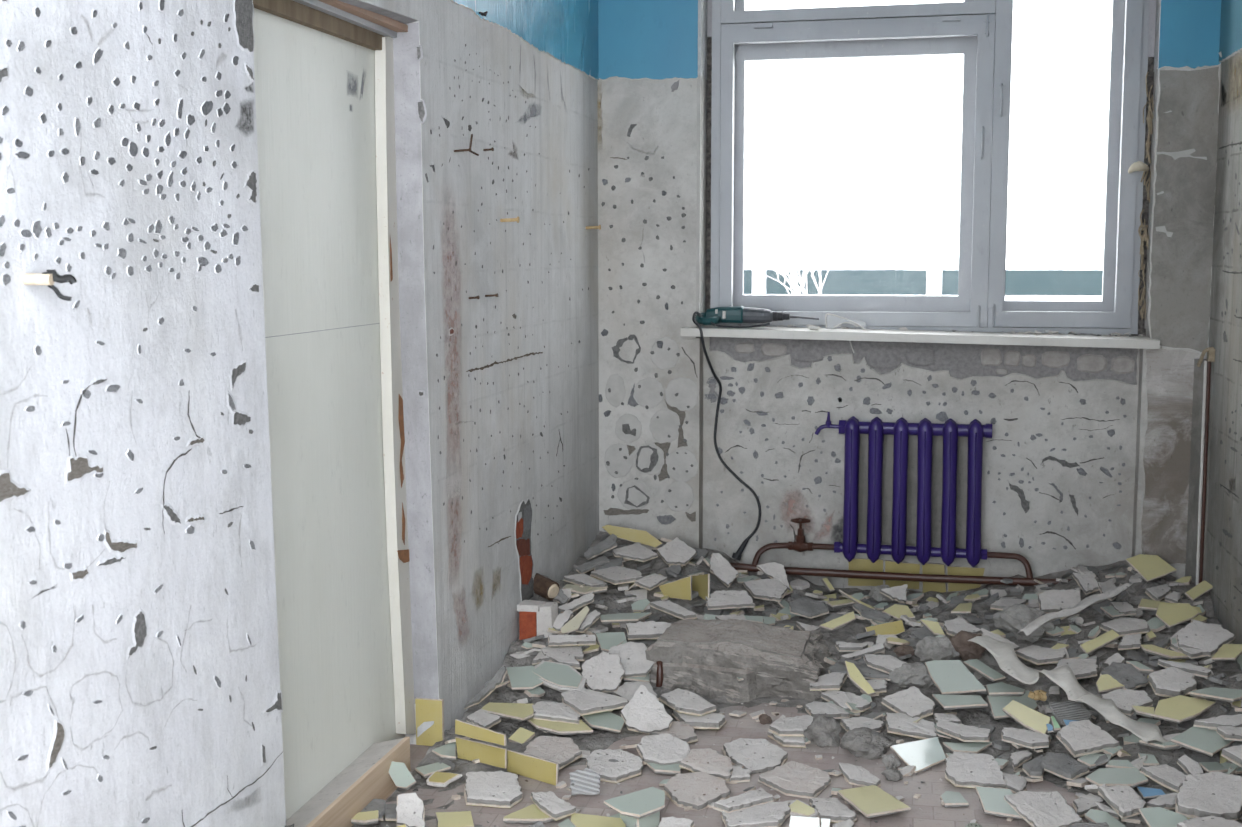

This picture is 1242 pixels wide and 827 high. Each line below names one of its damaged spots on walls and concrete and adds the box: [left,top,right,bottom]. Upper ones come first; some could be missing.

peeling [601,156,664,209]
peeling [643,176,686,250]
crack [466,352,543,372]
flaking render [0,469,31,505]
crack [66,384,91,456]
flaking render [65,450,104,484]
crack [162,396,202,534]
spalling [599,320,697,548]
flaking render [705,330,1140,637]
spalling [510,484,652,653]
flaking render [115,608,181,660]
crack [182,753,282,827]